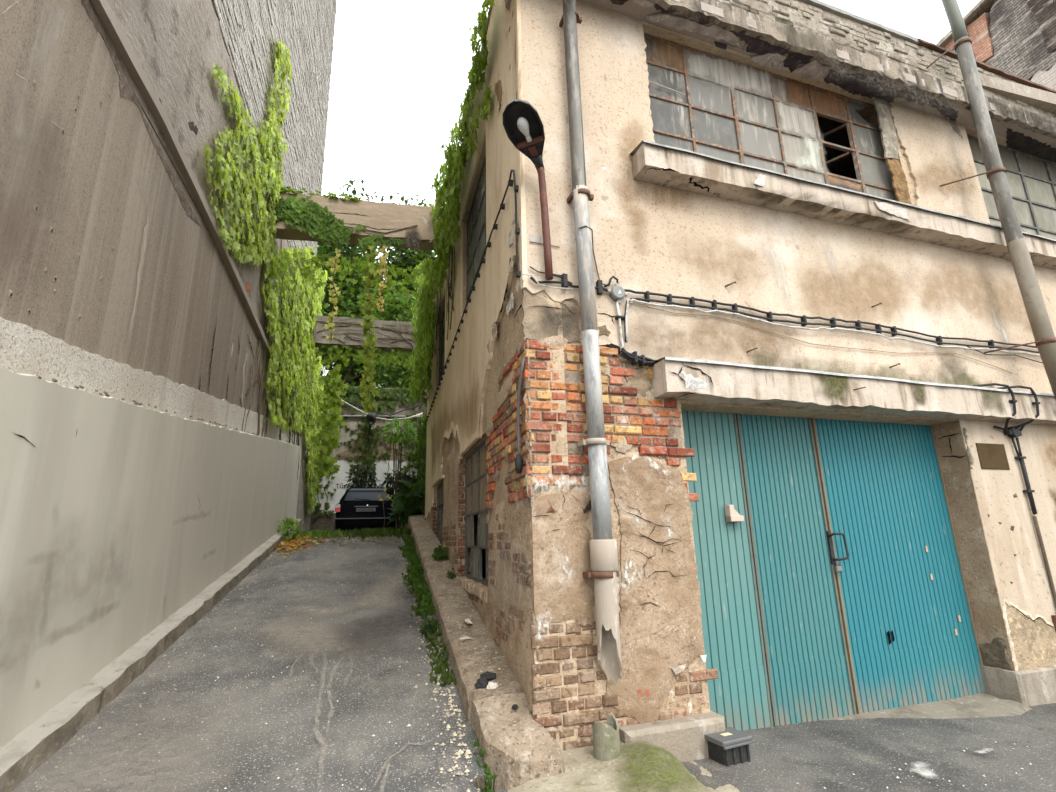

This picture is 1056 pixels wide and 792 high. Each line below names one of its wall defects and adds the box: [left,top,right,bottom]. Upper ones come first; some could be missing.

flaking render [494,76,504,113]
peeling [611,0,963,221]
crack [645,168,720,195]
leakage [756,193,905,228]
leakage [808,252,897,312]
crack [668,365,714,397]
leakage [946,359,965,381]
flaking render [427,228,639,751]
flaking render [597,322,699,626]
crack [531,457,705,724]
spalling [979,598,1056,671]
flaking render [657,655,718,721]